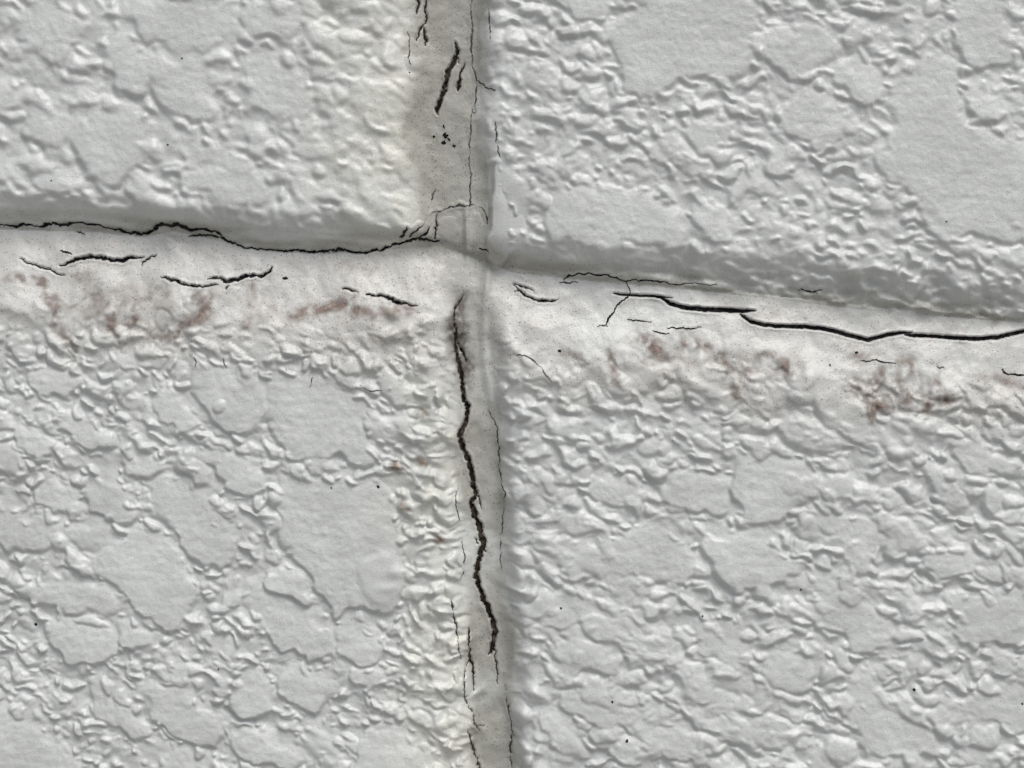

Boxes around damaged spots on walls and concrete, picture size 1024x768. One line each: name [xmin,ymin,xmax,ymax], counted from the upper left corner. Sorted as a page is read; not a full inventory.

crack [0,0,500,289]
crack [342,288,418,307]
crack [514,272,1024,364]
crack [451,295,517,768]